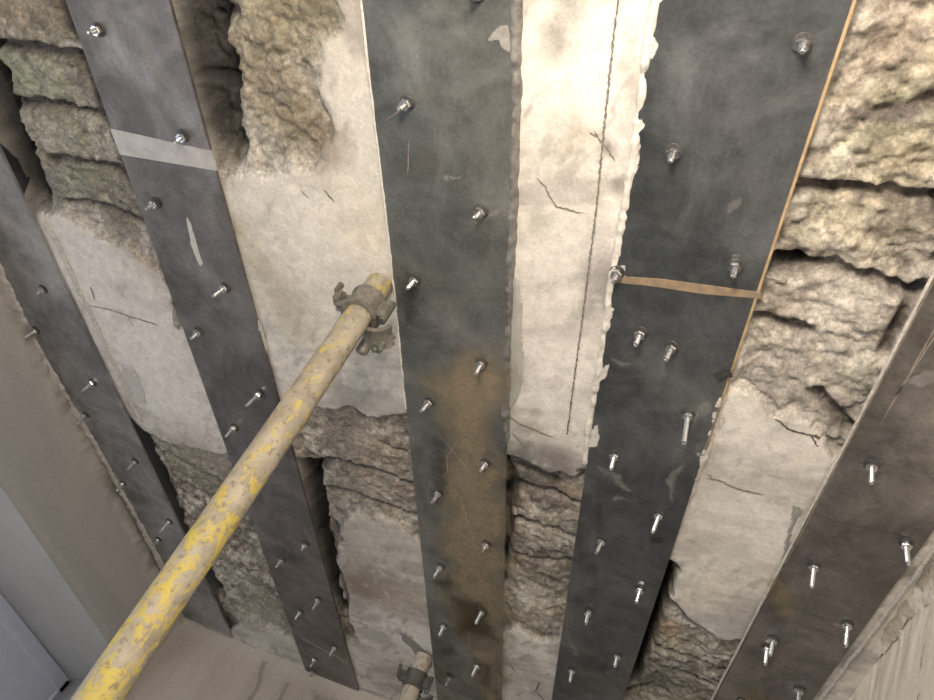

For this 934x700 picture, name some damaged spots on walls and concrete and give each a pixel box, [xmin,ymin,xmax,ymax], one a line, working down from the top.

spalling [0,0,174,308]
spalling [189,0,346,187]
spalling [729,0,934,460]
spalling [292,405,420,644]
corrosion [424,356,507,700]
spalling [503,454,586,645]
spalling [623,559,743,700]